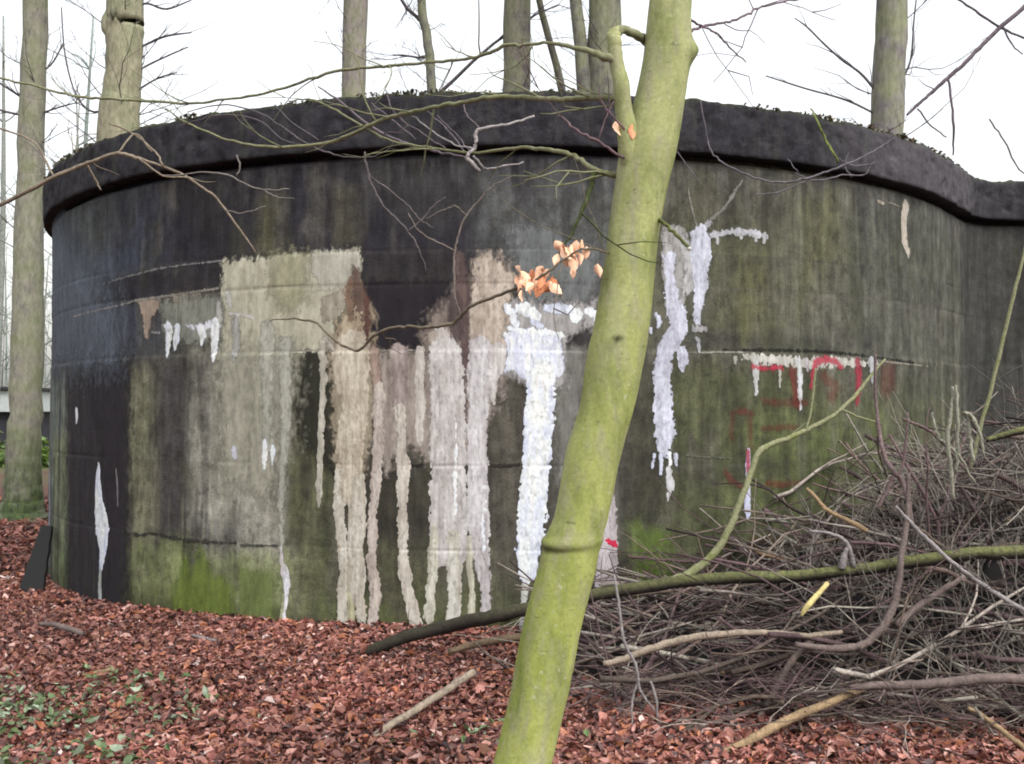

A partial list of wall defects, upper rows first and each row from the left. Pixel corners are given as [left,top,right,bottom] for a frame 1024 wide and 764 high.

water stain [52,212,343,621]
peeling [210,248,363,506]
rust [344,265,371,341]
water stain [486,224,599,481]
water stain [733,352,879,411]